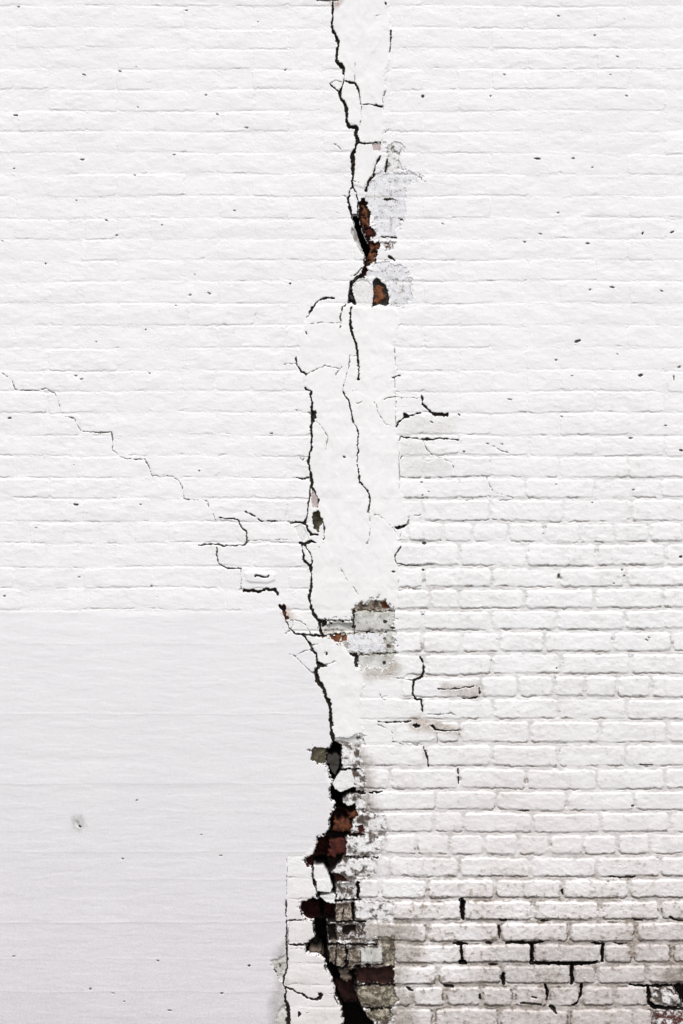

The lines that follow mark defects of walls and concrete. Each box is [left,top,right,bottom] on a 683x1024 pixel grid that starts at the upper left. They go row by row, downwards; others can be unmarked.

crack [316,0,392,219]
spalling [347,141,419,308]
crack [2,297,513,742]
spalling [321,594,398,672]
crack [377,656,481,767]
spalling [270,954,287,982]
spalling [275,1004,287,1024]
crack [282,859,331,1024]
spalling [297,733,413,1024]